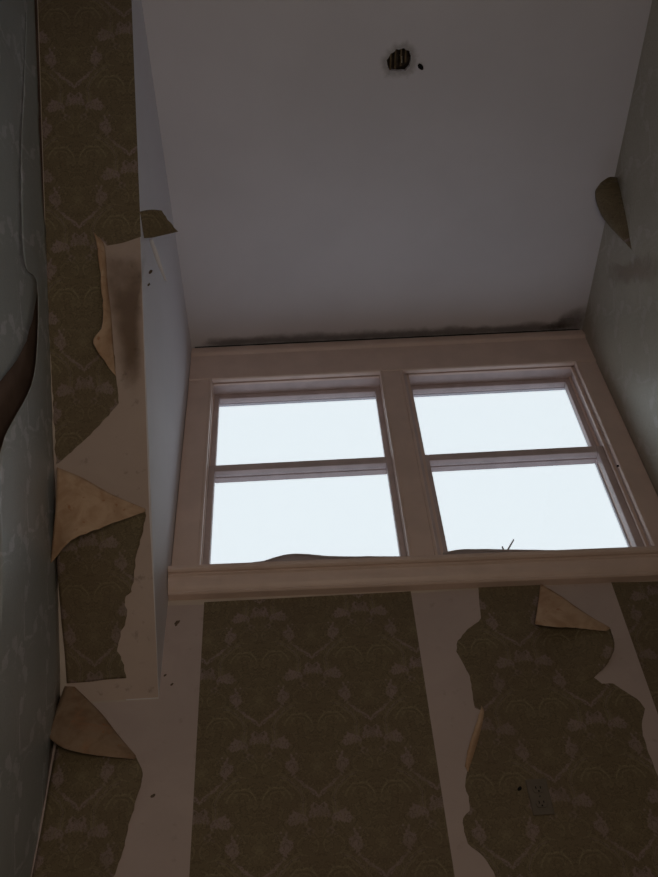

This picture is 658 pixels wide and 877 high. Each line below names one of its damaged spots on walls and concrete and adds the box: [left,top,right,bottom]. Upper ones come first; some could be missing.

flaking render [54,237,204,877]
flaking render [411,589,495,877]
flaking render [545,582,658,775]